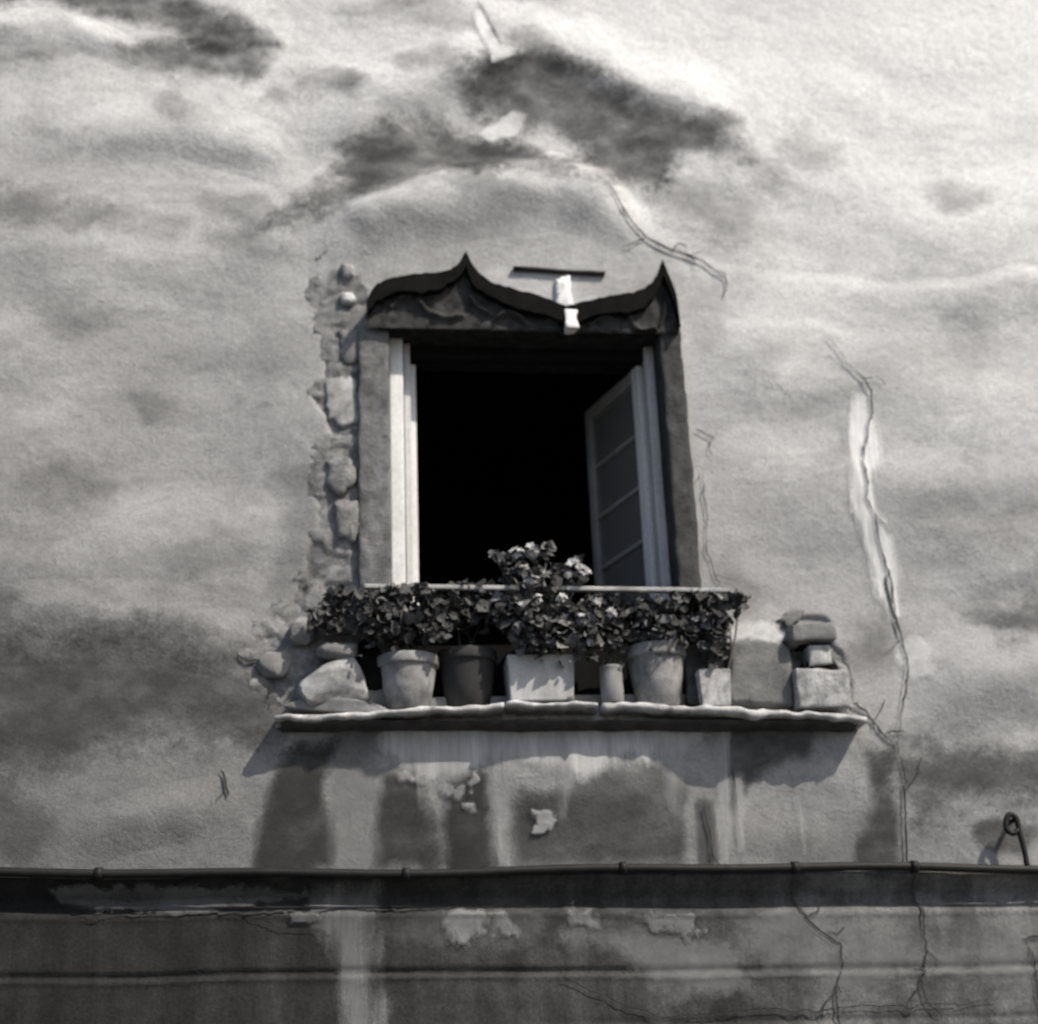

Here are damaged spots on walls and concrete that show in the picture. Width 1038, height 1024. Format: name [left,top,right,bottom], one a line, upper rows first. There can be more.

leakage [64,0,281,77]
crack [478,0,516,46]
leakage [267,10,740,226]
crack [608,181,727,298]
flaking render [239,262,397,720]
crack [562,335,994,1024]
leakage [255,740,337,878]
leakage [374,710,705,869]
peeling [531,809,557,834]
peeling [49,883,309,915]
peeling [442,908,519,945]
crack [1022,935,1038,996]